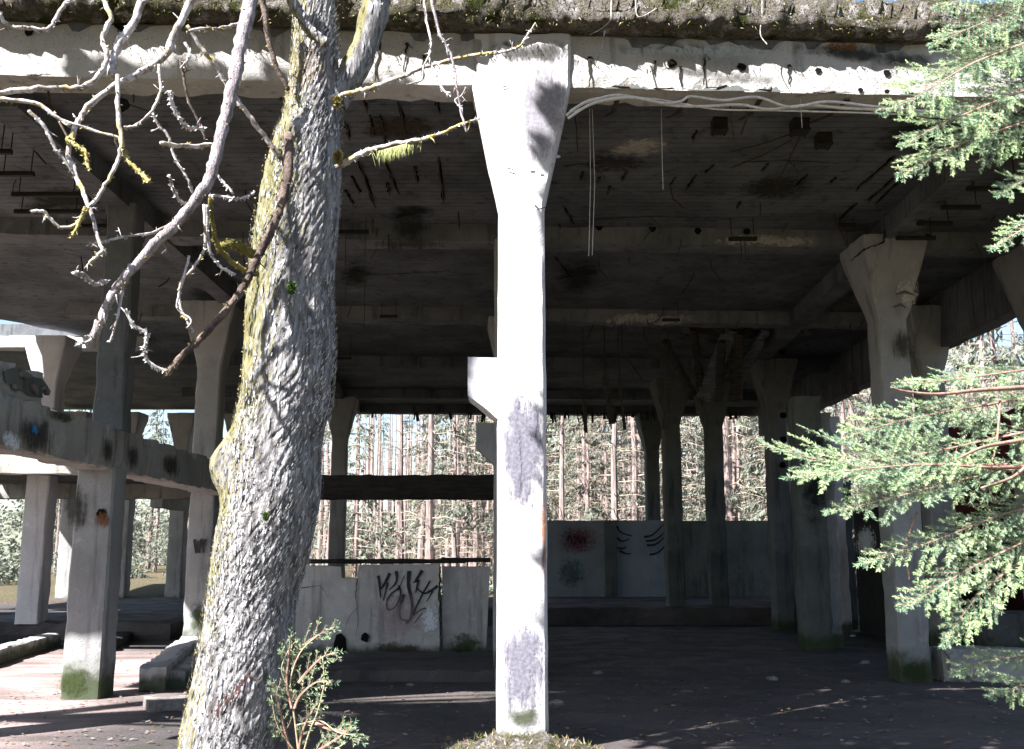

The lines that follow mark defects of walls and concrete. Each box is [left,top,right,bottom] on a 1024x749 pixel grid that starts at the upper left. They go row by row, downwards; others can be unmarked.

spalling [604,83,785,92]
crack [850,230,886,261]
leakage [22,420,53,454]